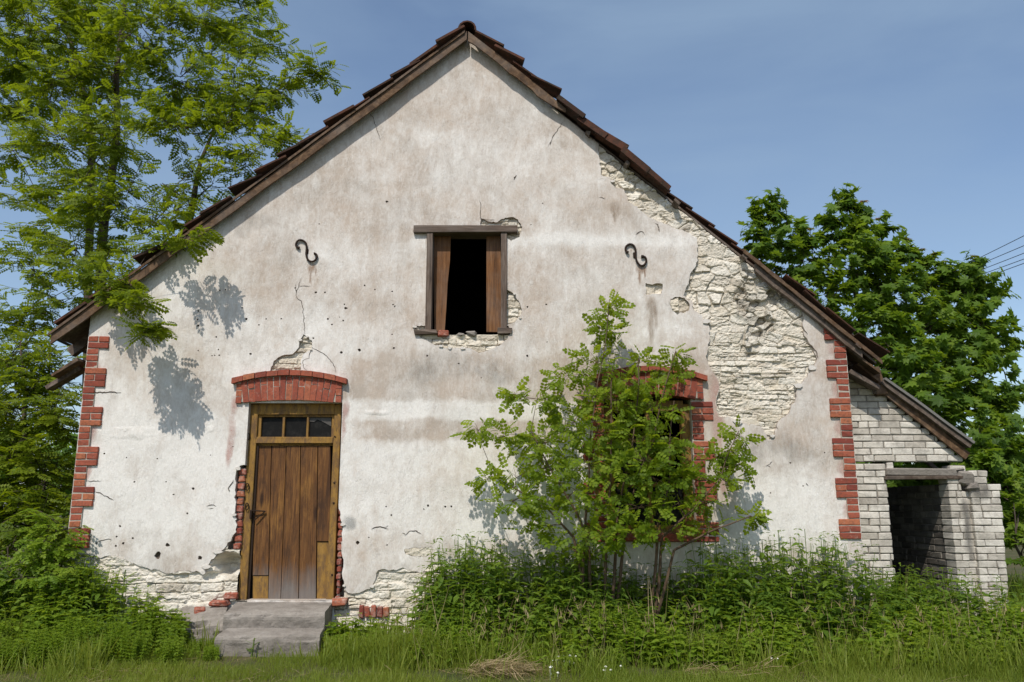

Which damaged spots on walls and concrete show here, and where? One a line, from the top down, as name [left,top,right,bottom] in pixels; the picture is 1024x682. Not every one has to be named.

flaking render [480,218,522,241]
flaking render [271,335,314,371]
crack [295,282,336,371]
flaking render [412,291,528,357]
flaking render [598,146,816,439]
flaking render [67,525,247,624]
flaking render [334,547,457,632]